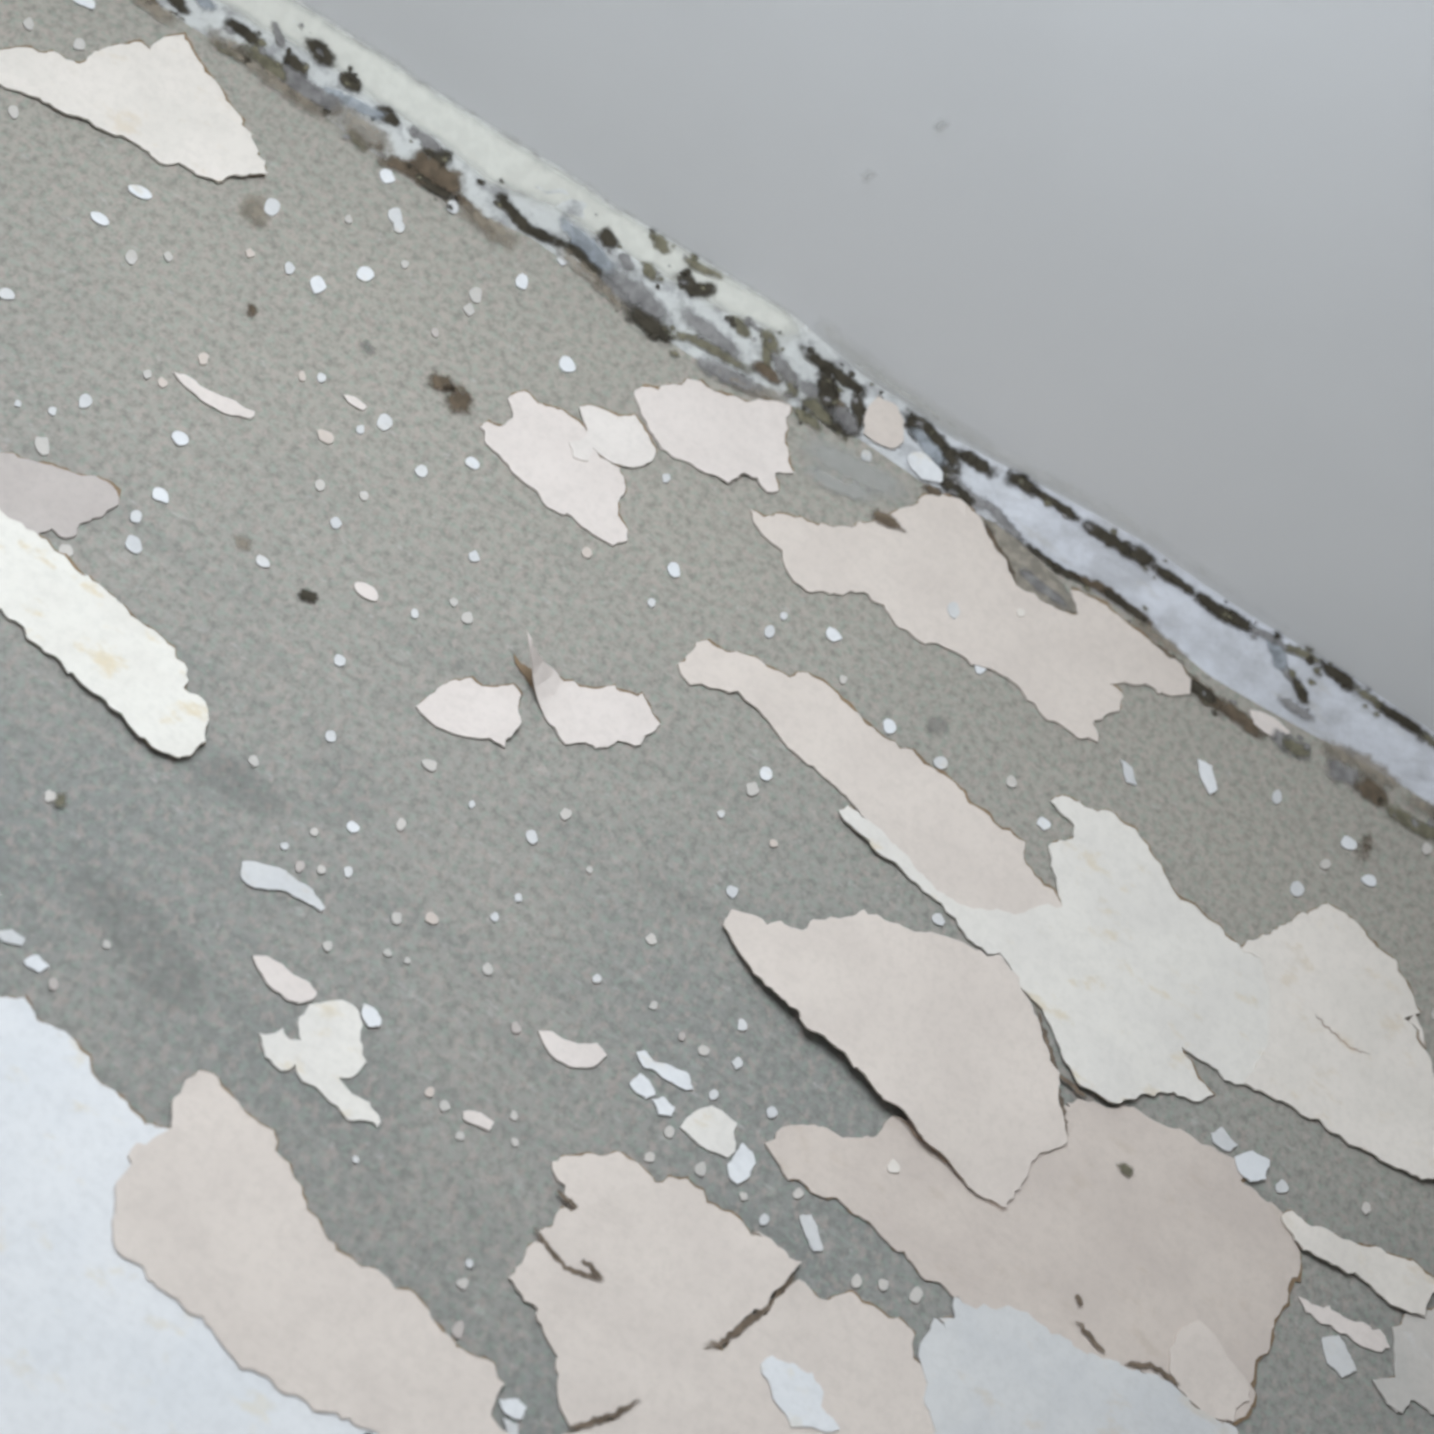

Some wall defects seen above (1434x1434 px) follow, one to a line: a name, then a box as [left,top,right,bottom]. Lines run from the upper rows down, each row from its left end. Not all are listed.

water stain [134,0,884,441]
peeling [0,452,209,759]
water stain [298,589,318,603]
water stain [873,508,905,532]
peeling [750,493,1191,743]
water stain [904,408,1434,840]
peeling [508,639,1434,1434]
peeling [0,995,509,1434]
crack [557,1189,578,1208]
crack [534,1228,602,1280]
crack [570,1400,637,1430]
crack [710,1274,794,1348]